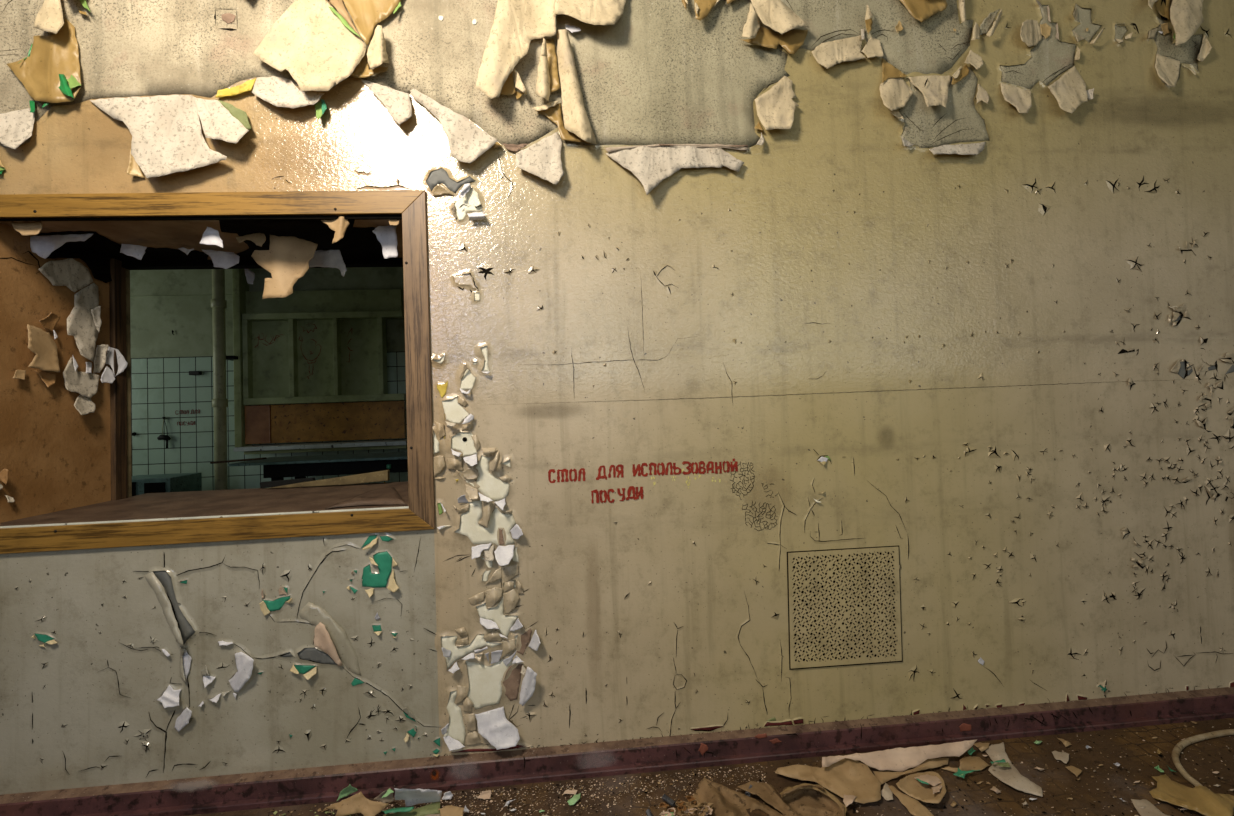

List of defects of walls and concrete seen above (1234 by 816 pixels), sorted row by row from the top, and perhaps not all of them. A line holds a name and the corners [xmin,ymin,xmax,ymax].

peeling [0,0,1212,226]
peeling [0,216,399,415]
peeling [449,269,484,305]
peeling [0,469,15,502]
peeling [382,341,550,757]
peeling [153,637,266,736]
crack [29,536,441,778]
peeling [625,724,723,756]
peeling [740,715,871,744]